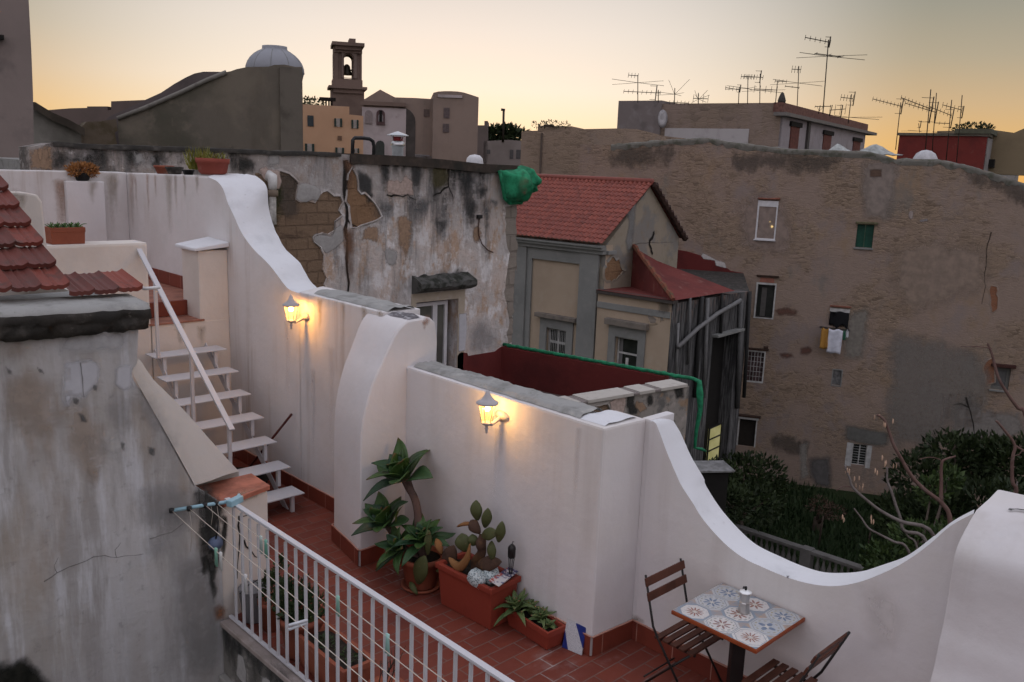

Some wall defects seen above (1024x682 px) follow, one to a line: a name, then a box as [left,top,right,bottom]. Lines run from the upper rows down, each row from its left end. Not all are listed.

spalling [255,167,397,288]
crack [343,160,357,292]
damp [358,165,422,201]
crack [387,169,453,200]
damp [382,169,497,252]
crack [635,232,665,255]
crack [982,232,992,302]
crack [44,525,181,582]
damp [194,485,284,682]